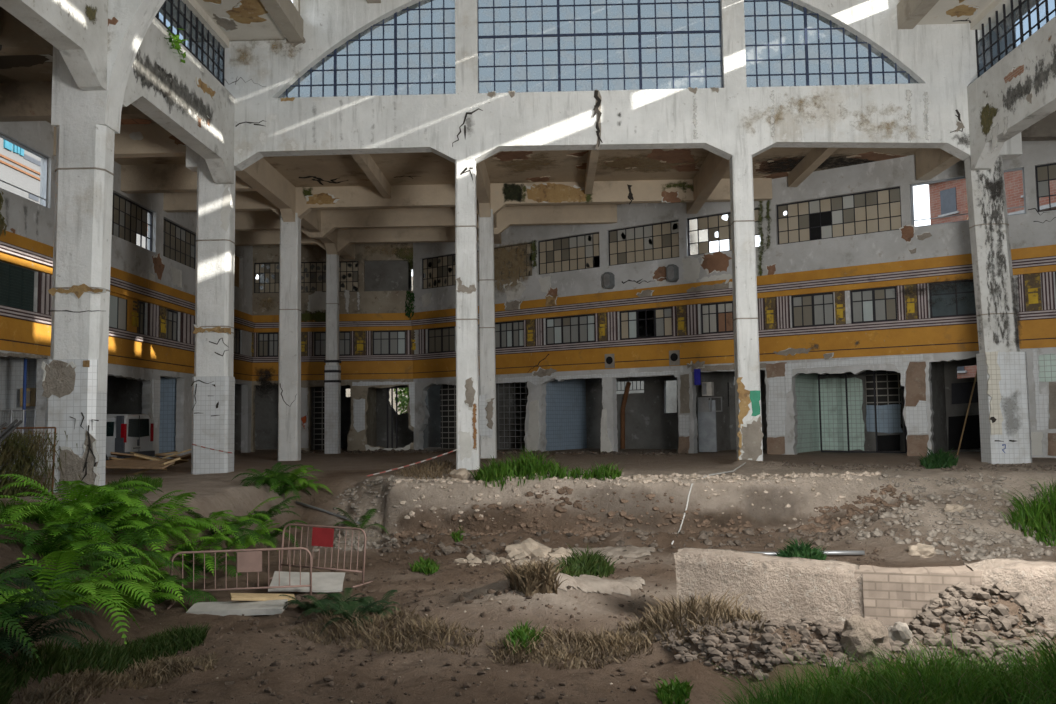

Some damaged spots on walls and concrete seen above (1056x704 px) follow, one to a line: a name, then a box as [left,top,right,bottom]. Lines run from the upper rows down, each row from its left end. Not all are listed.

peeling [203,0,268,32]
peeling [946,0,980,18]
crack [452,108,483,180]
crack [593,89,603,150]
water stain [976,45,1056,349]
spalling [686,251,733,292]
spalling [41,360,90,398]
crack [71,412,99,485]
spalling [736,377,764,461]